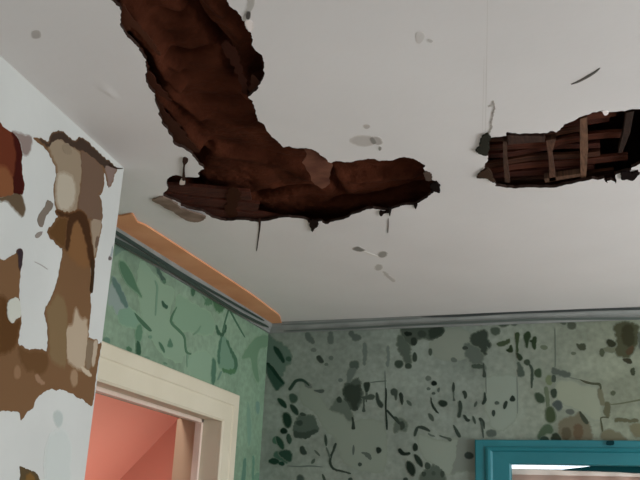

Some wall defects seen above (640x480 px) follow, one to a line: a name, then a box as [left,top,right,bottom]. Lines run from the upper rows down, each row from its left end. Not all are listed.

peeling [0,123,117,420]
mould [266,334,293,377]
mould [329,330,368,422]
mould [385,327,445,368]
mould [463,324,517,371]
mould [599,320,640,376]
mould [273,412,319,466]
leakage [418,436,475,480]
leakage [539,388,640,446]